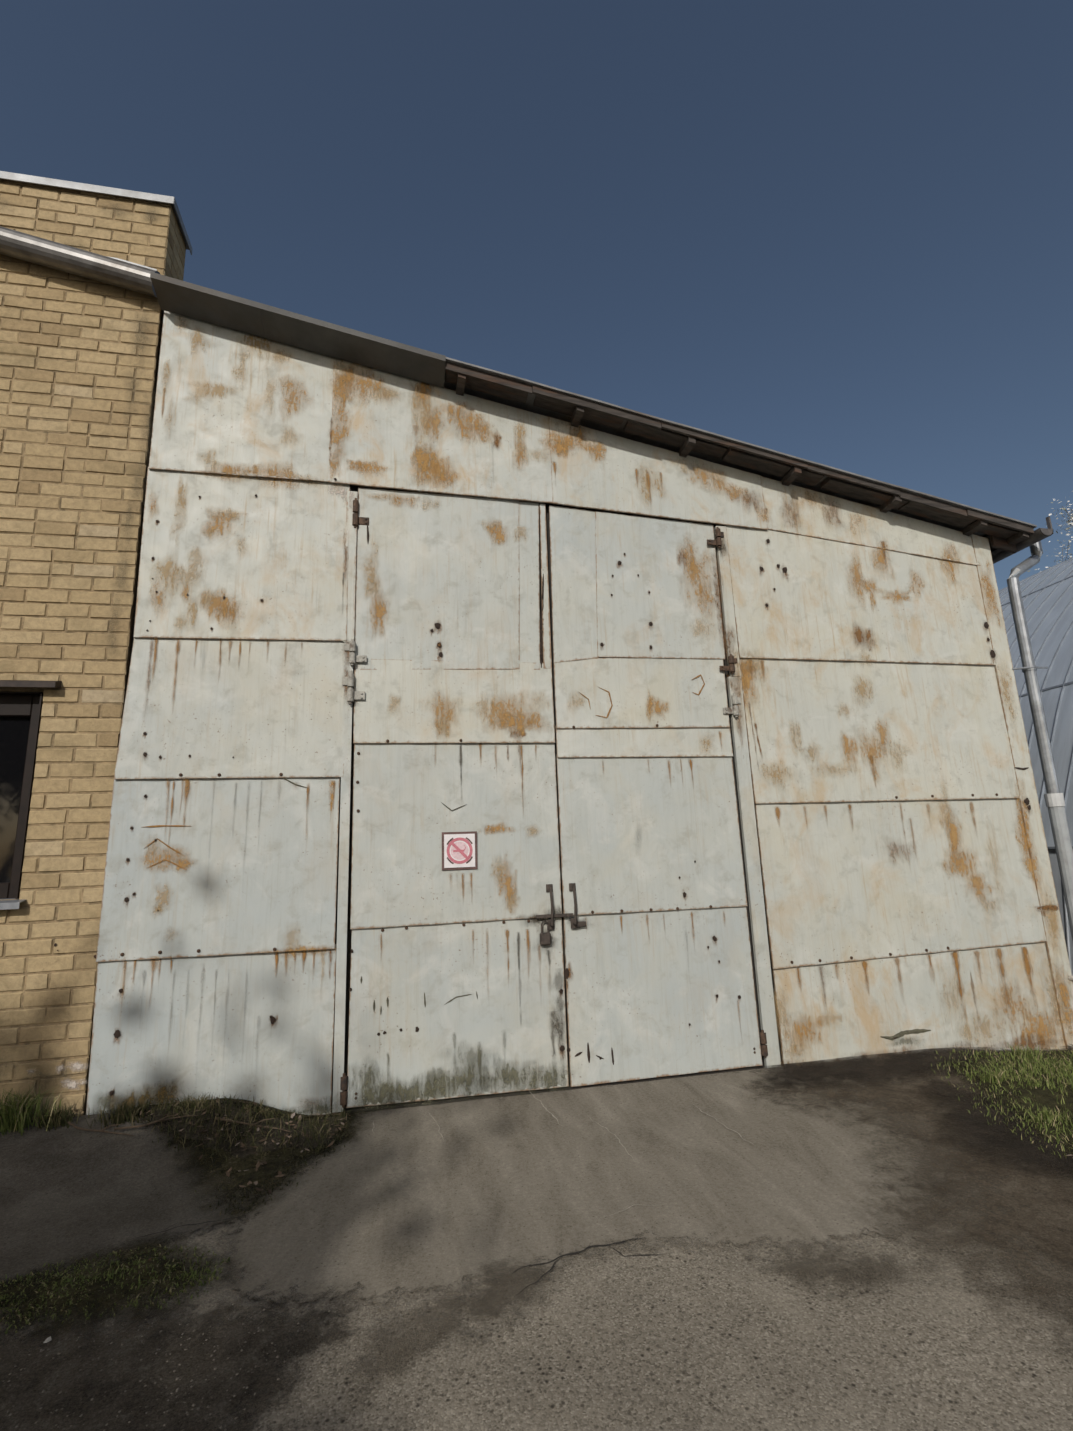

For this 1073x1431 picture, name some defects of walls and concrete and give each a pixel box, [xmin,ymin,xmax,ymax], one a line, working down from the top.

rust [329,367,390,473]
rust [413,382,527,484]
rust [850,542,922,605]
rust [152,557,236,697]
rust [126,778,190,870]
rust [941,803,991,899]
rust [1015,788,1057,945]
rust [275,945,336,975]
rust [997,947,1073,1050]
water stain [360,1013,570,1111]
water stain [930,1082,1073,1178]
crack [512,1237,665,1294]